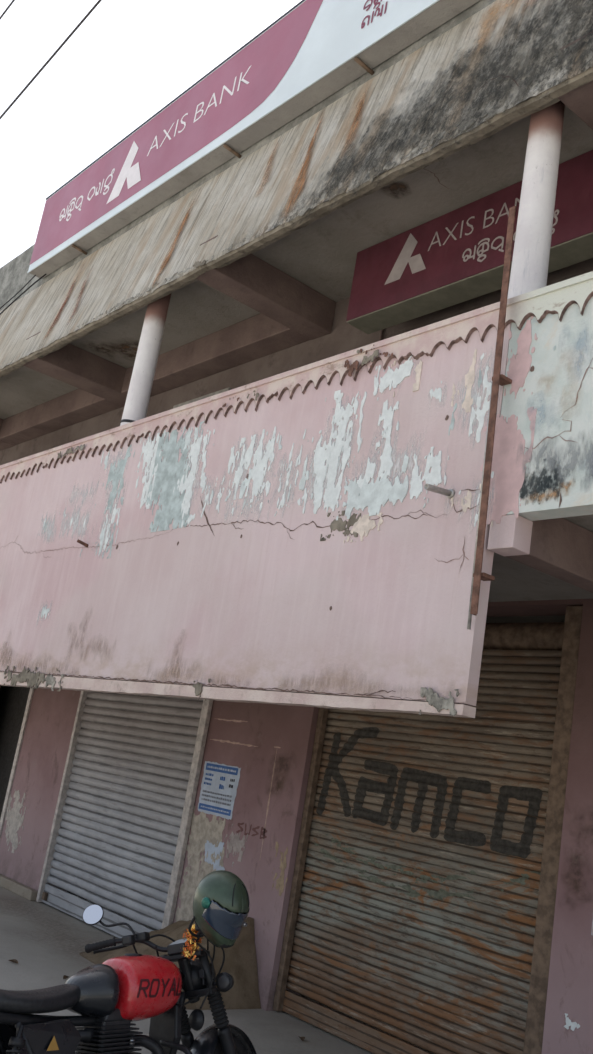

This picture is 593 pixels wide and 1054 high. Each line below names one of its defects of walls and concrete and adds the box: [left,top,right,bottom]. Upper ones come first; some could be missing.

leakage [311,0,593,207]
rust [287,119,322,210]
rust [153,207,191,285]
leakage [0,291,593,484]
crack [16,496,347,558]
peeling [63,316,538,559]
crack [372,489,479,520]
crack [436,537,469,572]
leakage [520,437,593,504]
spalling [419,687,460,716]